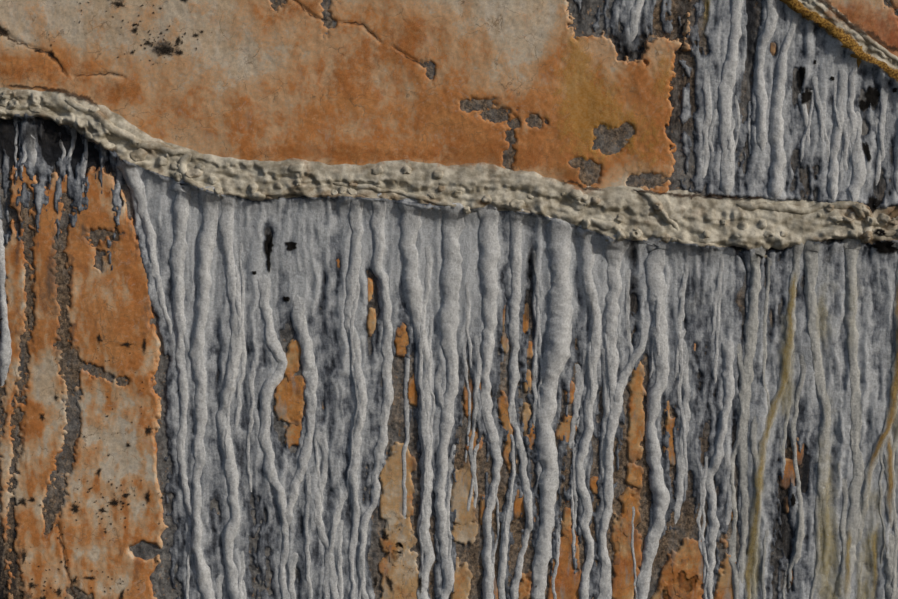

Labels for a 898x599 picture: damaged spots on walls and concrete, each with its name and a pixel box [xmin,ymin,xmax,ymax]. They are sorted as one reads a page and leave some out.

crack [0,30,123,106]
crack [294,0,422,64]
flaking render [460,98,548,170]
flaking render [566,0,725,199]
flaking render [739,0,762,124]
flaking render [791,60,817,115]
rust [780,0,898,81]
flaking render [121,181,135,225]
flaking render [786,149,819,202]
flaking render [867,147,893,213]
flaking render [0,118,129,599]
water stain [77,469,142,541]